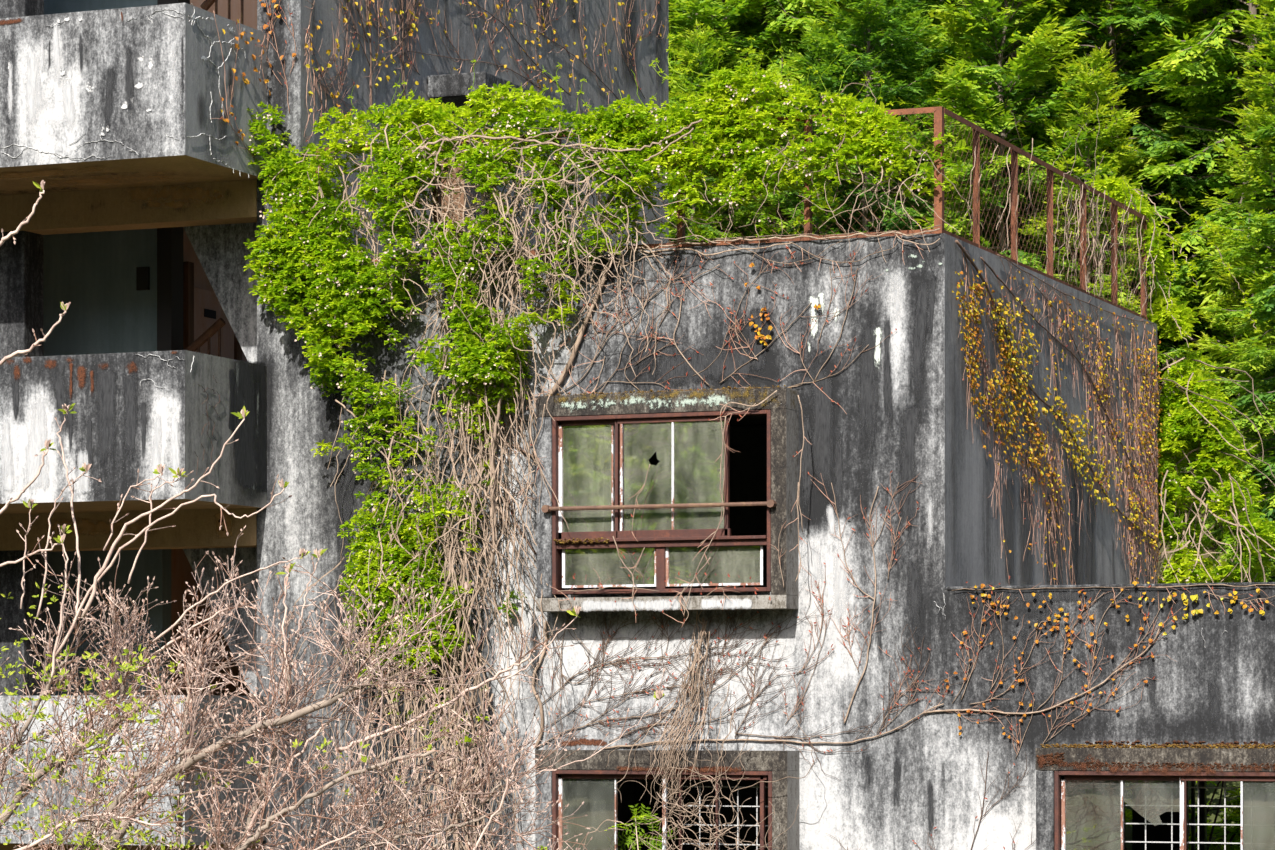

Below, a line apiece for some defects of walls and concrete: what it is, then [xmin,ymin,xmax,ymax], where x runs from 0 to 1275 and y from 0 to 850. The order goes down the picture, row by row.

water stain [8,22,74,126]
water stain [104,46,134,129]
water stain [2,366,180,492]
water stain [229,360,271,493]
water stain [626,308,766,387]
water stain [801,293,843,534]
water stain [858,274,936,538]
water stain [582,599,680,611]
water stain [701,598,752,609]
water stain [957,479,1217,625]
water stain [280,686,308,811]
water stain [893,760,901,805]